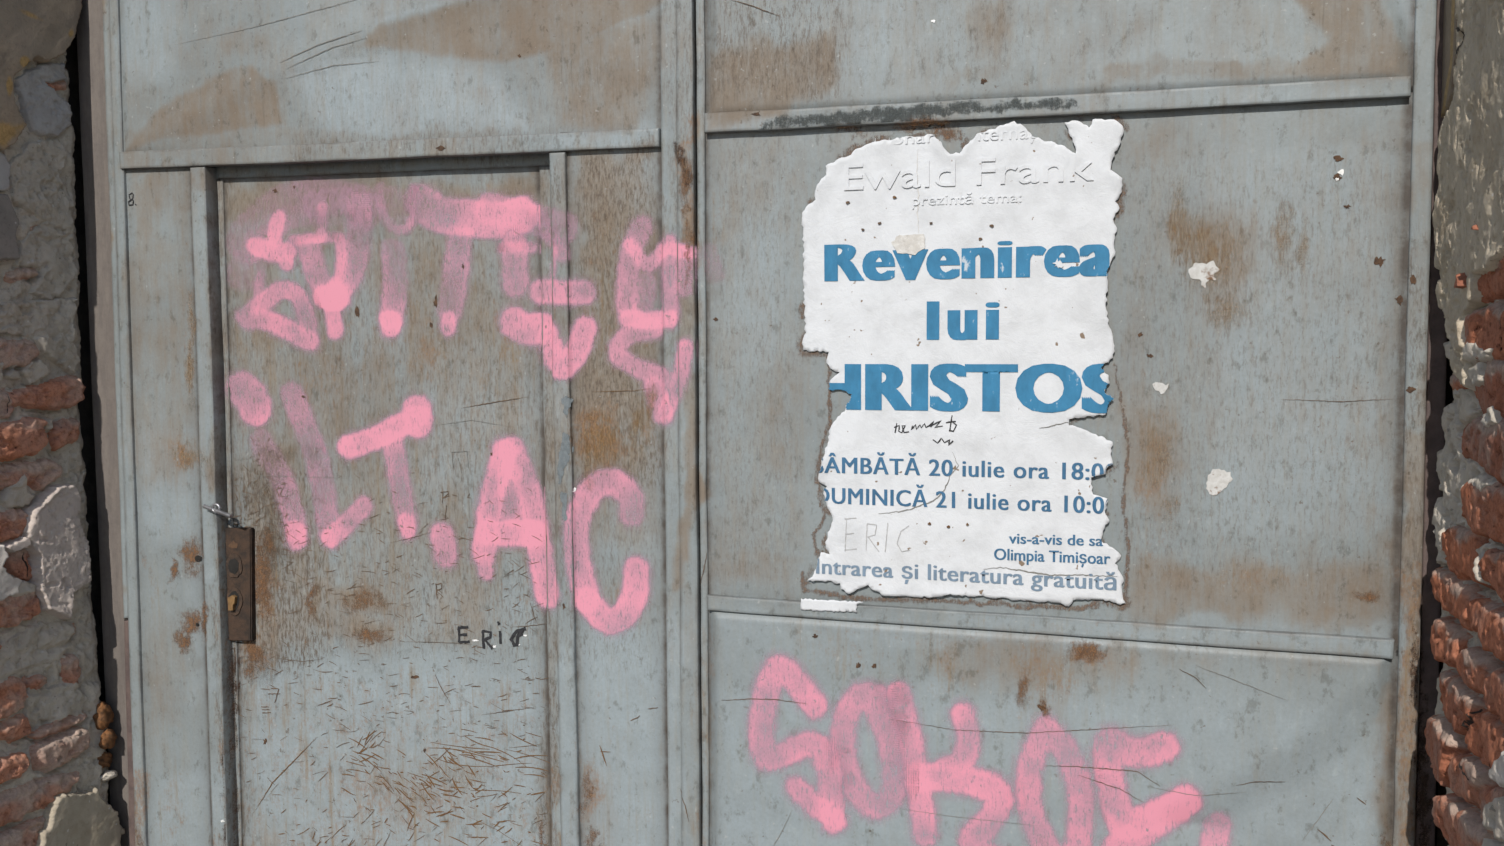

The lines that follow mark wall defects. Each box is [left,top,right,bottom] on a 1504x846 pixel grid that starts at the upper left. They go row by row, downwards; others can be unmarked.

peeling [0,0,82,150]
rust [171,540,201,578]
peeling [0,484,92,723]
rust [174,606,208,652]
peeling [36,785,125,846]